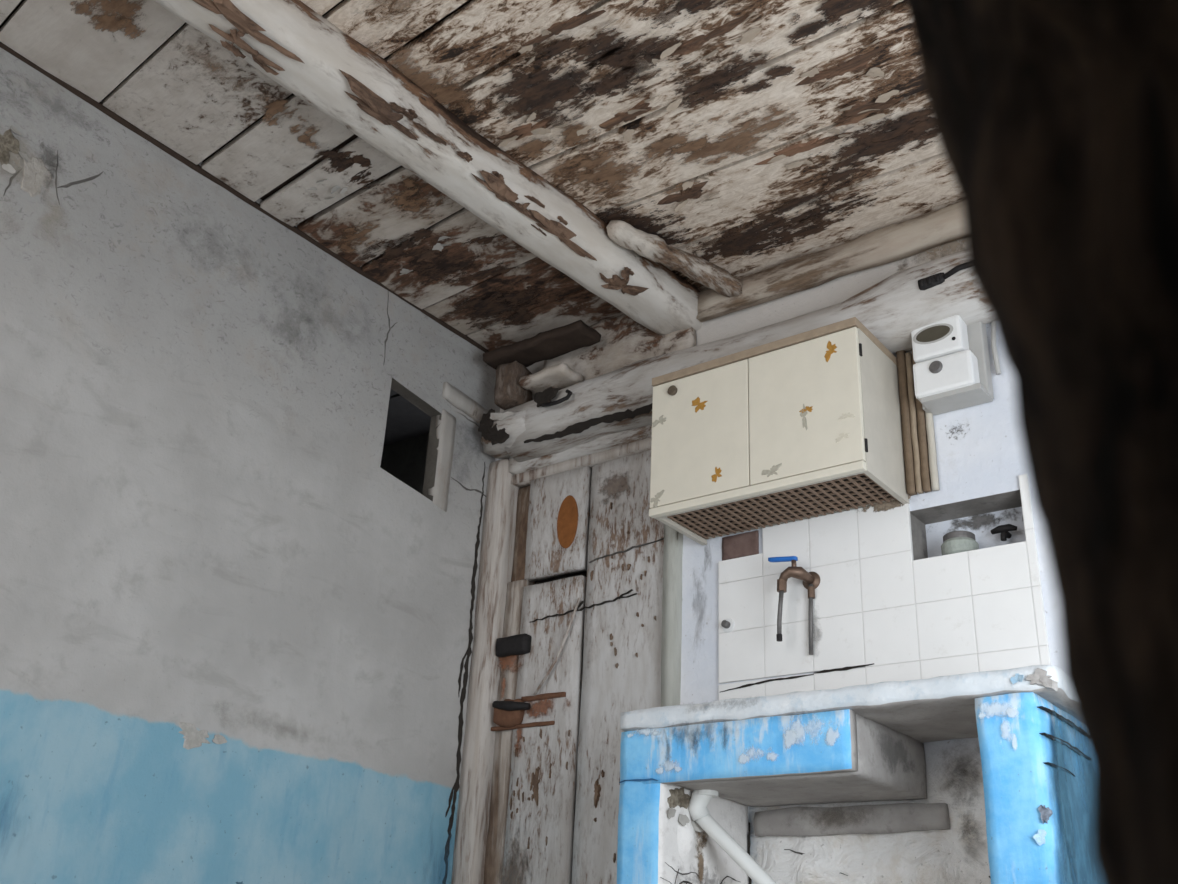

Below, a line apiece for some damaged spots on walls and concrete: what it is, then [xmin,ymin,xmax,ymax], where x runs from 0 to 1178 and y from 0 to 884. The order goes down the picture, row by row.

peeling [192,0,305,75]
peeling [518,0,618,68]
peeling [652,12,762,64]
peeling [795,39,886,90]
peeling [497,95,682,147]
peeling [754,90,904,169]
peeling [339,69,649,296]
peeling [657,177,720,212]
crack [442,462,486,884]
peeling [739,717,839,764]
peeling [510,763,552,819]
crack [660,822,752,884]